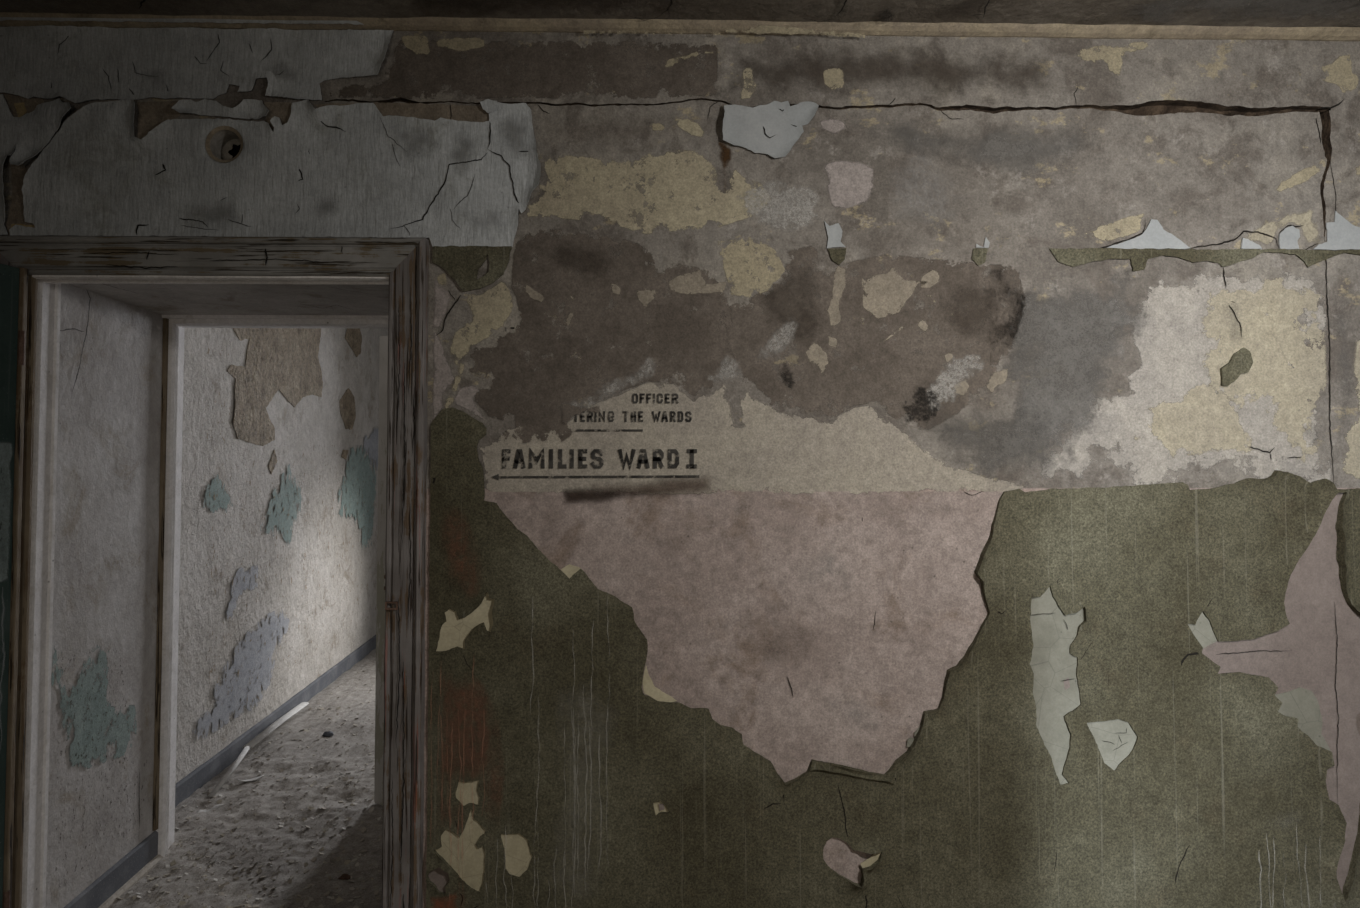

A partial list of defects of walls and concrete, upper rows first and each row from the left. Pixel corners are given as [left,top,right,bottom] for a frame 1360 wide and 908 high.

peeling [0,17,541,420]
peeling [722,101,819,158]
crack [325,87,1343,483]
spalling [227,328,323,474]
spalling [339,388,356,430]
peeling [436,592,495,651]
peeling [484,491,1003,908]
peeling [1030,580,1084,785]
peeling [1087,719,1137,770]
peeling [1181,493,1360,894]